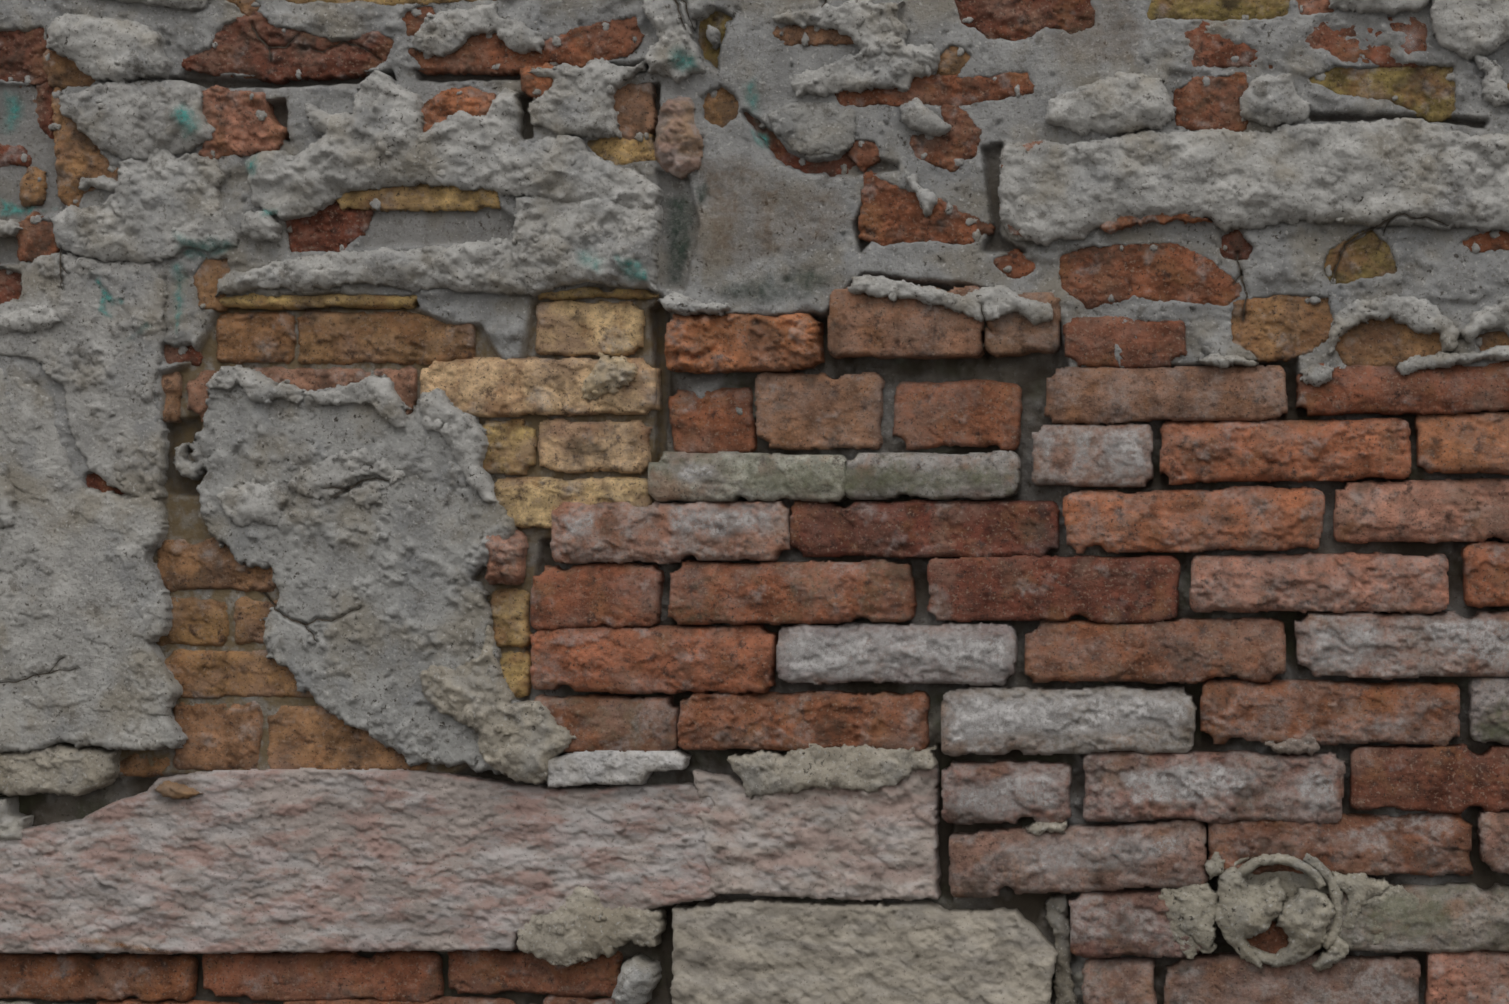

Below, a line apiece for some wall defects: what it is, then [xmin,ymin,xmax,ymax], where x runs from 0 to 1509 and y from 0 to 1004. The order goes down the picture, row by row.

spalling [954,0,1095,41]
spalling [1147,0,1509,122]
spalling [1173,72,1249,132]
crack [1332,213,1449,282]
spalling [1059,213,1509,376]
peeling [0,0,1053,841]
crack [323,478,389,498]
crack [263,592,361,642]
peeling [1263,734,1321,757]
peeling [1022,820,1069,836]